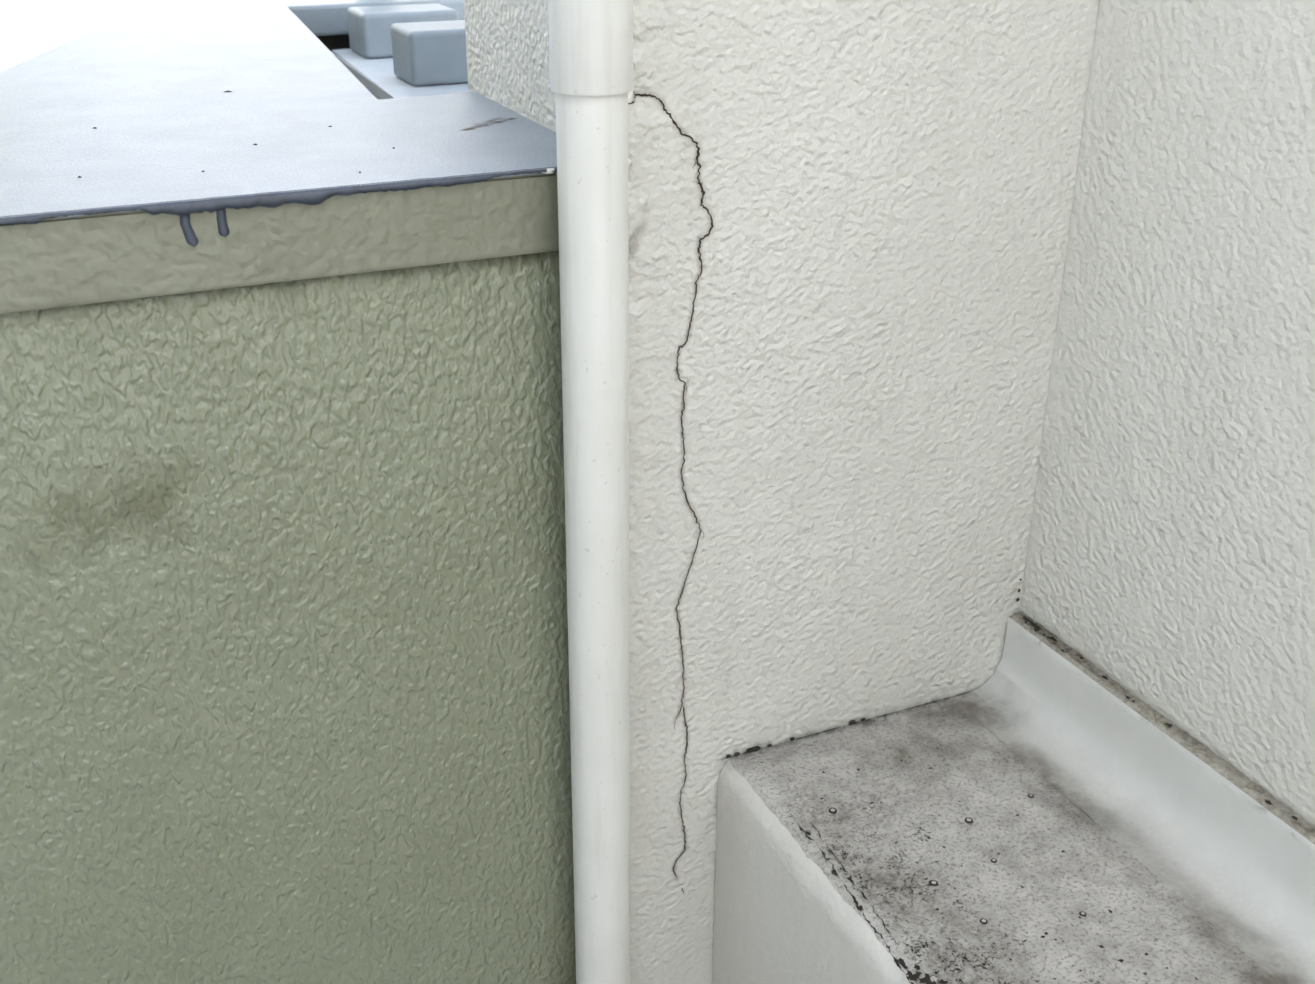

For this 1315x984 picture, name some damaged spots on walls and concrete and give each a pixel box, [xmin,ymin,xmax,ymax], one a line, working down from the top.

crack [628,91,714,894]
mould [1014,579,1108,680]
leakage [726,744,772,758]
leakage [790,714,887,744]